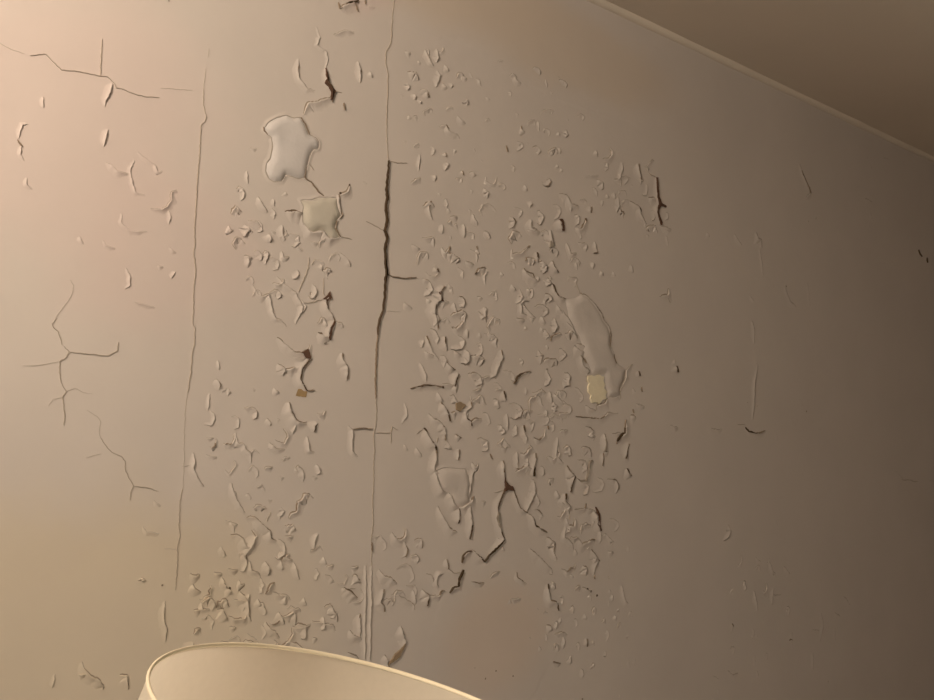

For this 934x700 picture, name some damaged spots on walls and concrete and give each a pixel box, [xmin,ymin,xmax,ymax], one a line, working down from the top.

peeling [338,0,375,15]
crack [0,43,209,643]
peeling [182,407,338,653]
crack [251,263,349,455]
crack [292,3,417,667]
peeling [309,529,423,663]
peeling [403,147,672,669]